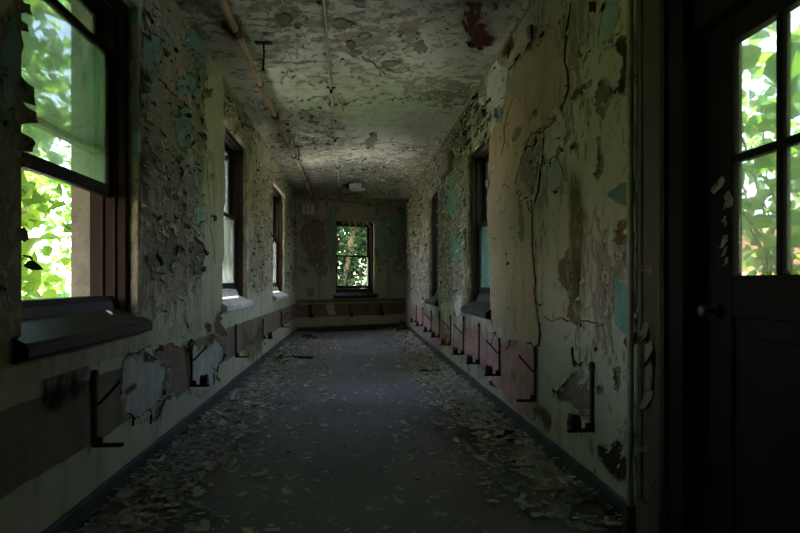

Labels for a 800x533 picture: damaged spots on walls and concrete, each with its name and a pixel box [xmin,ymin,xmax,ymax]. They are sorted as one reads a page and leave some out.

peeling [120,310,227,426]
peeling [61,331,348,533]
peeling [139,0,638,533]
crack [501,2,604,348]
peeling [604,270,653,409]